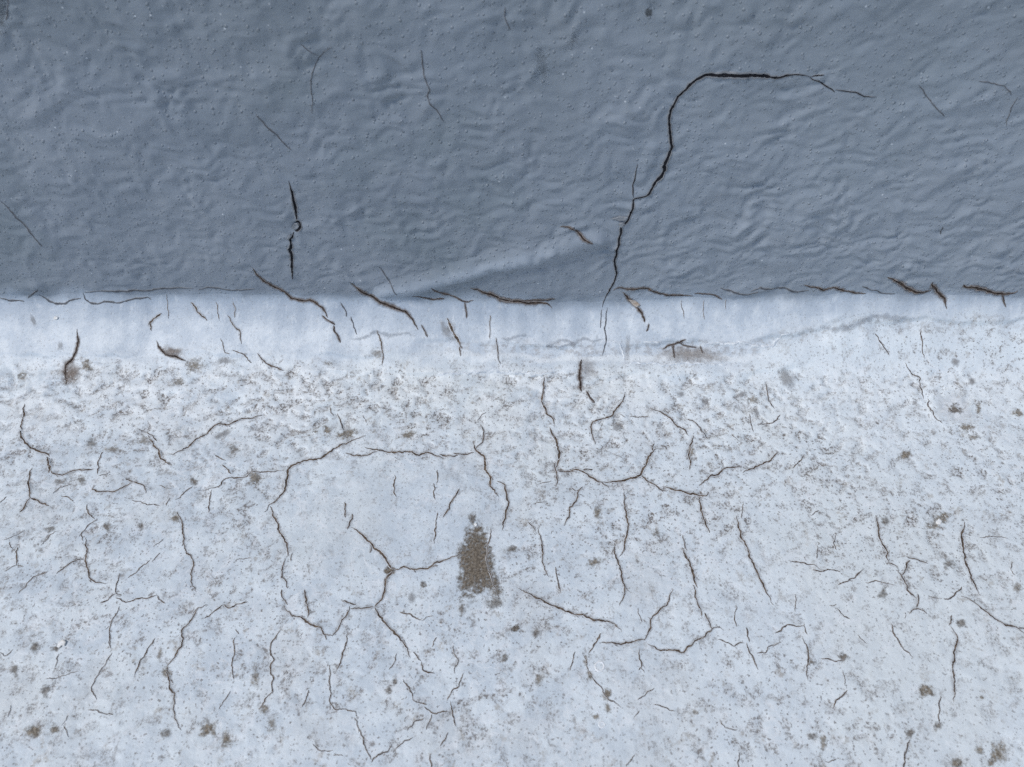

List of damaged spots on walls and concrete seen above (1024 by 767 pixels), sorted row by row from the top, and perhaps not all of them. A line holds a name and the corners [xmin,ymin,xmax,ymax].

crack [63,332,80,384]
crack [0,181,554,371]
crack [517,71,1024,725]
crack [0,404,510,767]
crack [720,721,740,767]
crack [902,740,910,767]